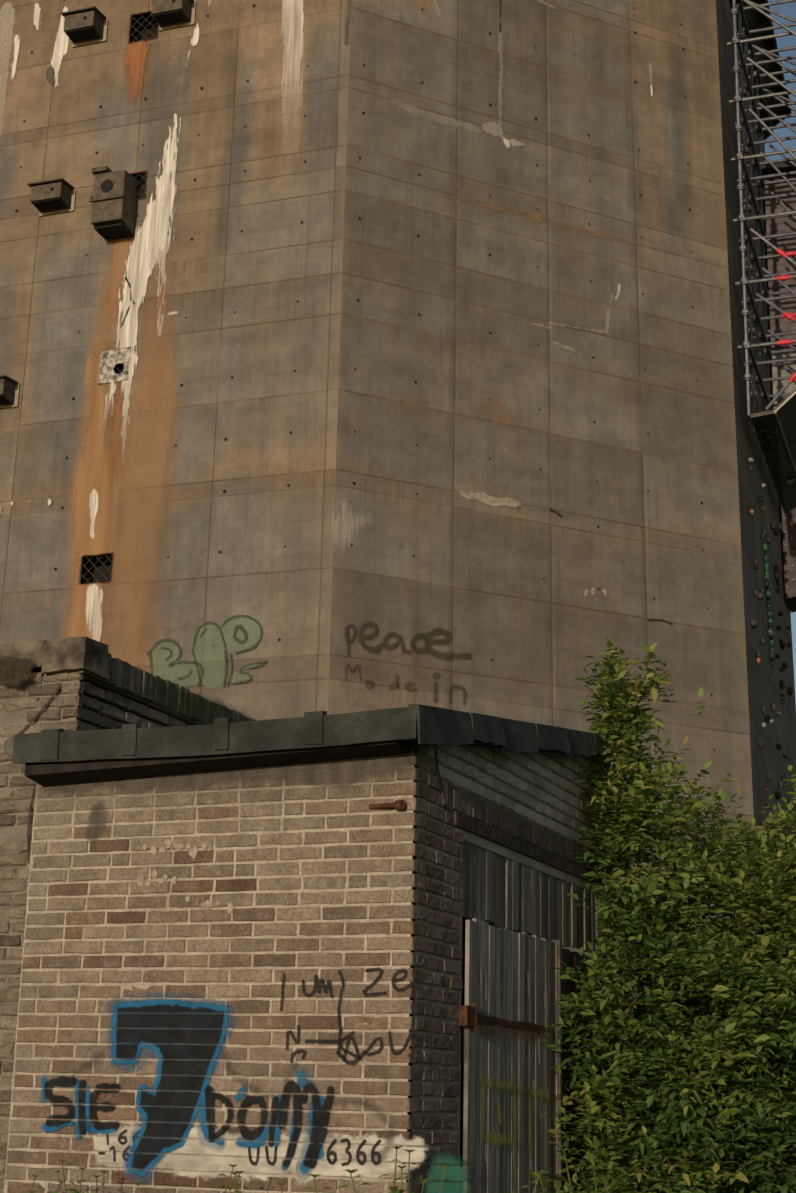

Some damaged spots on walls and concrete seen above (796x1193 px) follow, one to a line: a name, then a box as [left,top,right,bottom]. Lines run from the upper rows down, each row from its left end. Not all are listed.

leakage [283,0,304,52]
corrosion [125,41,149,100]
leakage [106,113,181,408]
corrosion [67,236,135,642]
leakage [86,584,103,638]